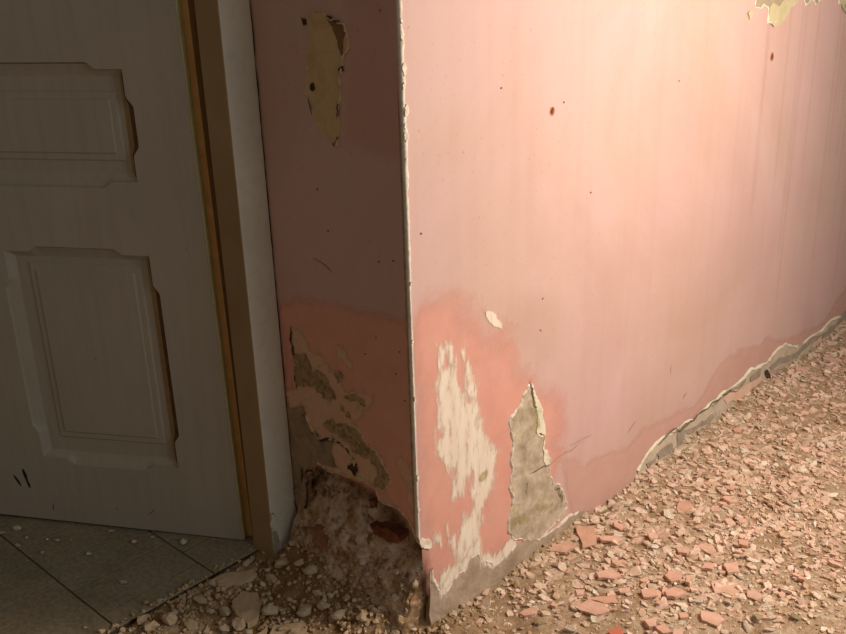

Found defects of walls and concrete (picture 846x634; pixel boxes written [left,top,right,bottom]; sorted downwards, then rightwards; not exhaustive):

peeling [748,0,820,27]
spalling [98,0,605,634]
leakage [280,301,532,587]
leakage [538,291,846,513]
spalling [637,311,846,476]